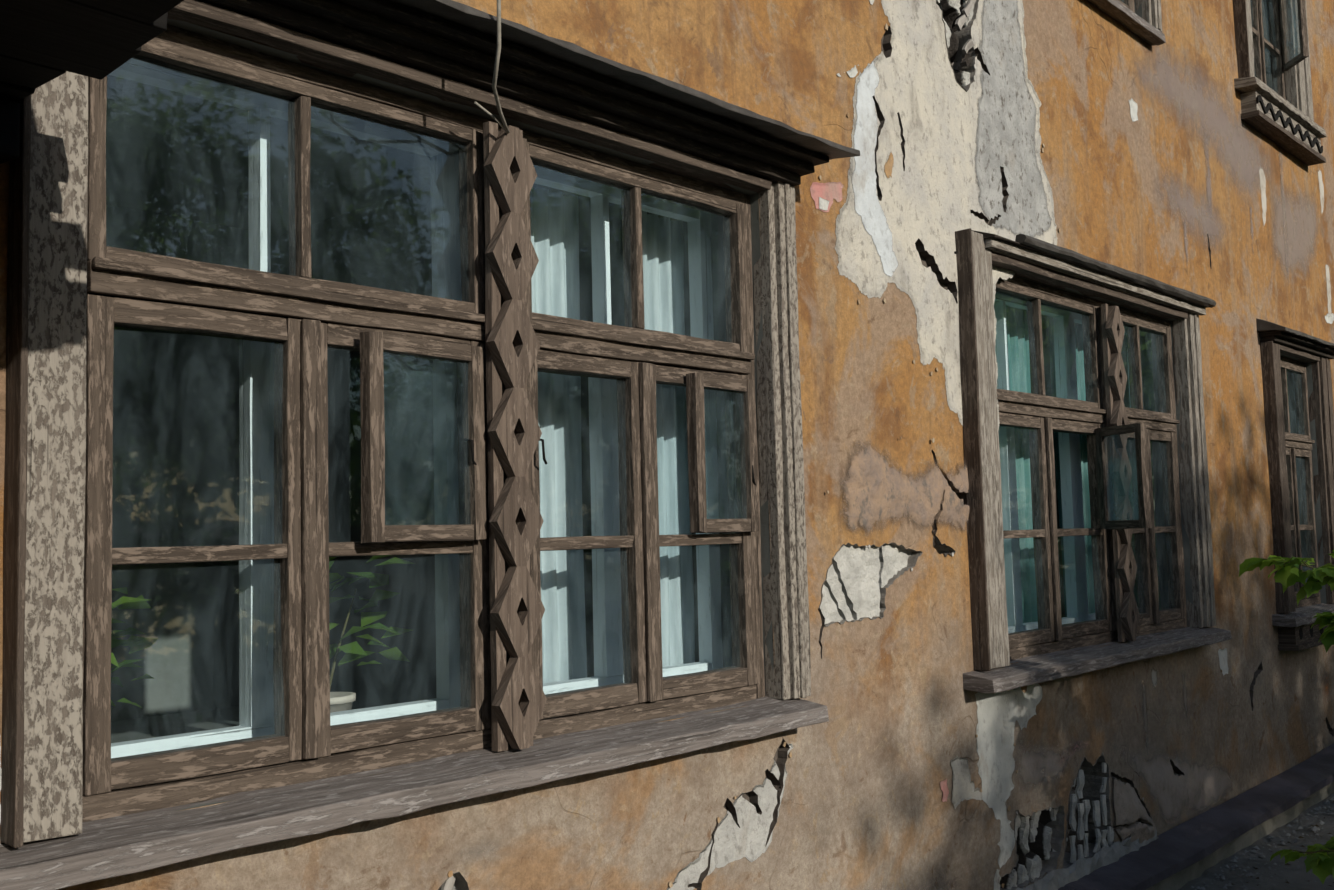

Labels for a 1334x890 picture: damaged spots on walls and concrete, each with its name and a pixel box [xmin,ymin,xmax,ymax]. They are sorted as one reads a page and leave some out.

peeling [810,0,1061,430]
crack [915,238,958,303]
crack [932,450,966,535]
spalling [818,531,956,627]
peeling [667,742,793,890]
peeling [940,683,1114,890]
peeling [1123,752,1232,819]
spalling [438,870,469,890]